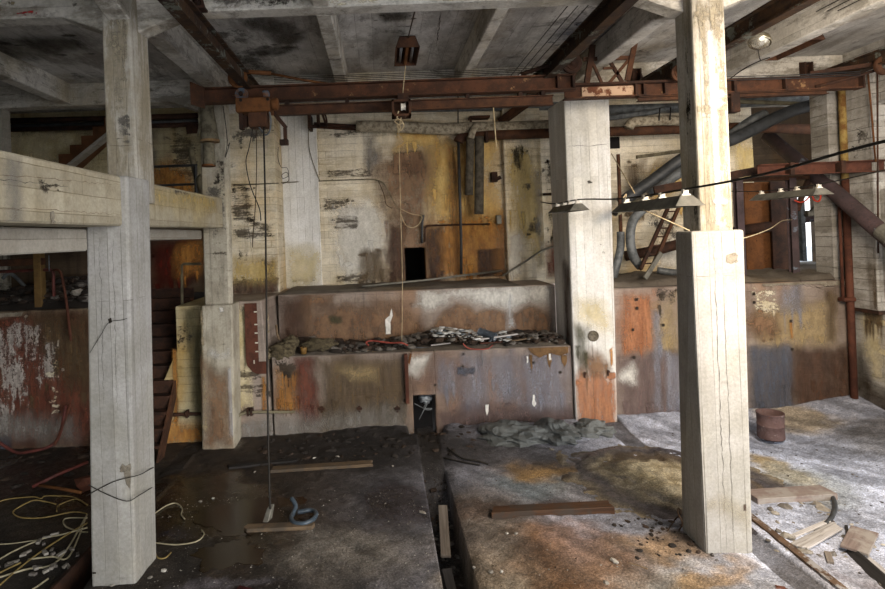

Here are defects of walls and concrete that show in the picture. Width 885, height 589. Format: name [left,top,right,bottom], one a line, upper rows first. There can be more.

leakage [218,17,302,72]
peeling [0,312,64,436]
leakage [168,127,275,239]
leakage [233,250,279,294]
leakage [177,305,571,447]
leakage [319,131,452,284]
corrosion [393,133,505,280]
leakage [421,146,553,340]
corrosion [548,244,570,345]
corrosion [572,348,616,423]
corrosion [622,295,676,358]